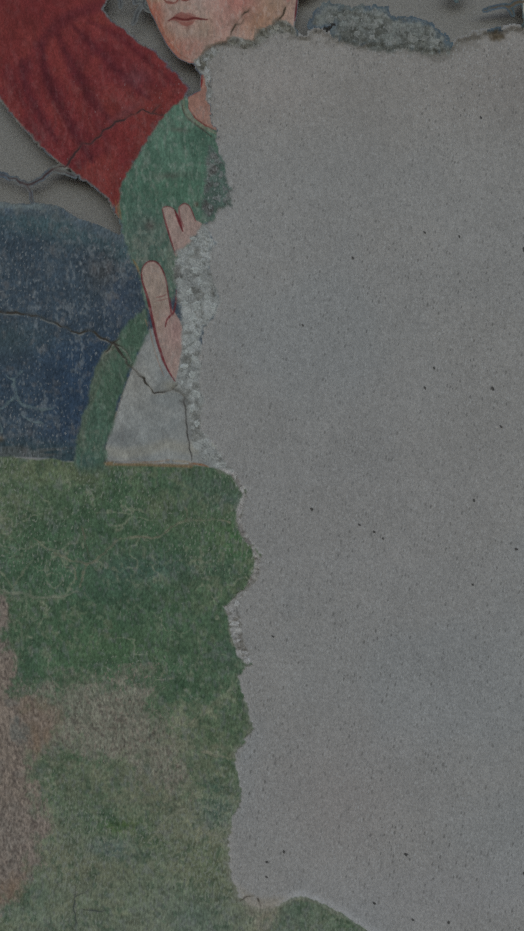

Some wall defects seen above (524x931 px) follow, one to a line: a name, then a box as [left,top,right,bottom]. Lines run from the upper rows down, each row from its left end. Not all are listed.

spalling [193,0,453,106]
crack [0,102,165,204]
crack [0,308,194,463]
spalling [171,143,261,667]